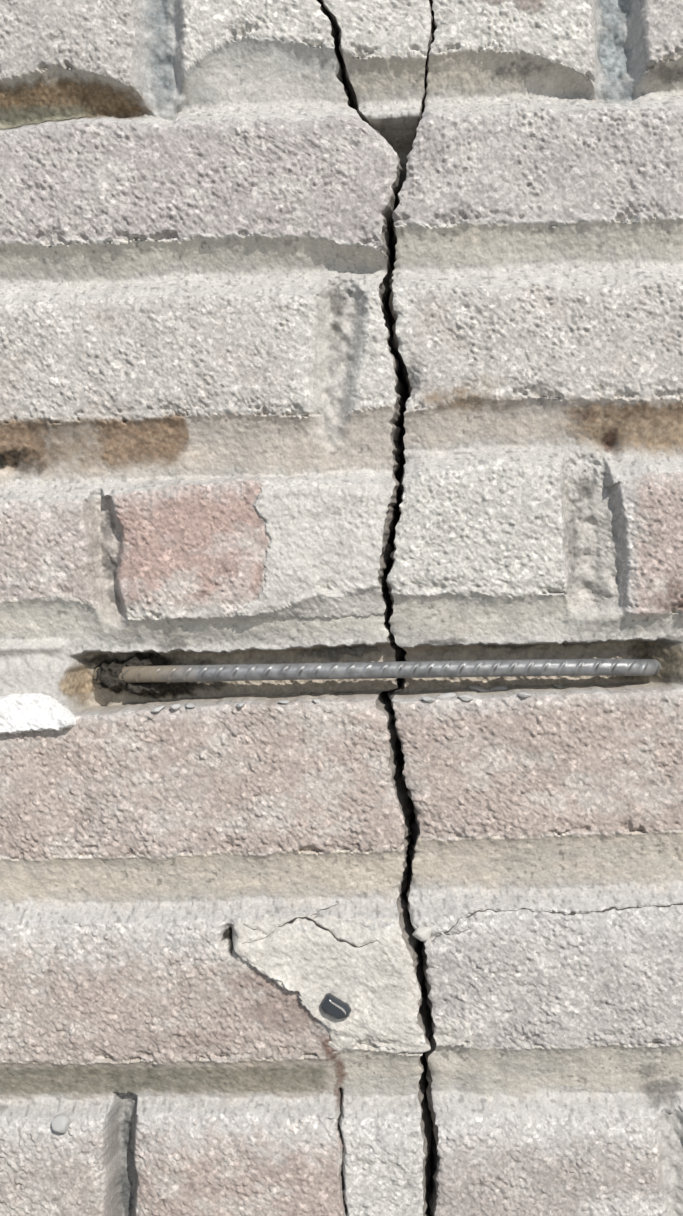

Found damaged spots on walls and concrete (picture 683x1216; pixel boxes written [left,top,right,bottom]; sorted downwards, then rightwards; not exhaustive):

crack [242,0,683,1216]